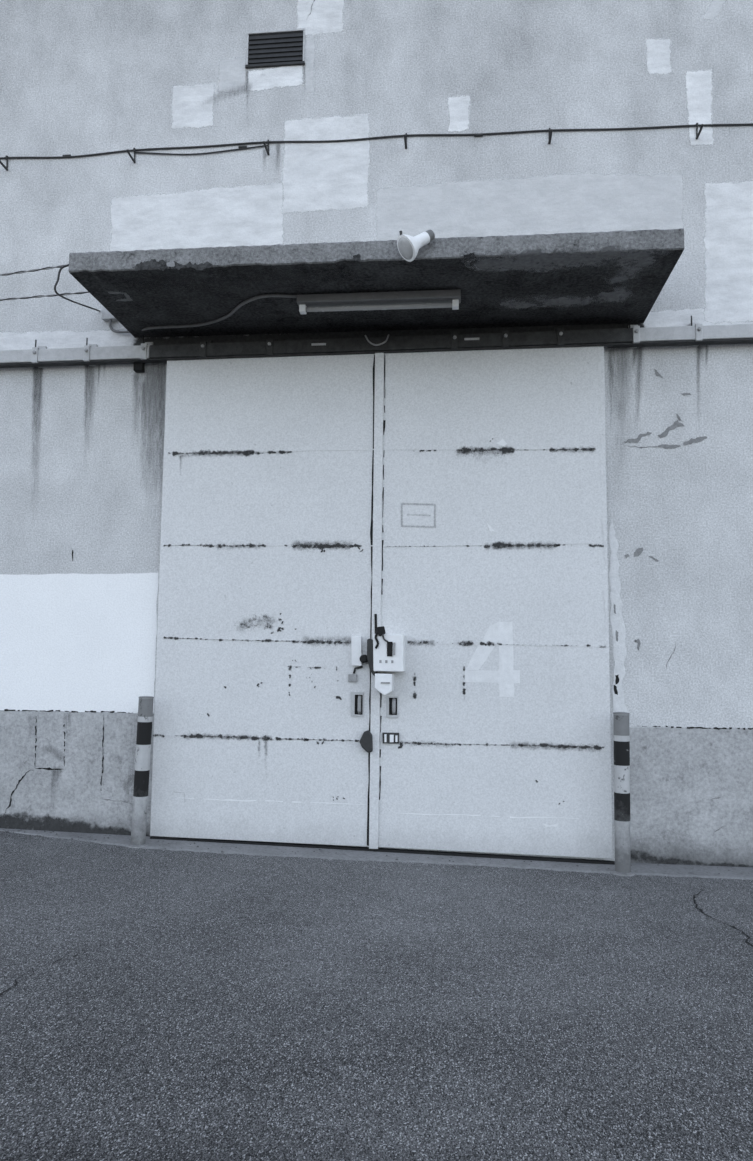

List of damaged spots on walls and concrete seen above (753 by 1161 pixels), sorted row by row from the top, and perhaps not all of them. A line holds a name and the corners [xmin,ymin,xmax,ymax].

corrosion [458,438,526,454]
corrosion [284,543,363,552]
corrosion [484,541,565,549]
corrosion [164,613,349,644]
corrosion [153,734,359,746]
corrosion [398,742,604,750]
crack [4,709,132,813]
crack [693,886,753,947]
crack [0,951,85,996]